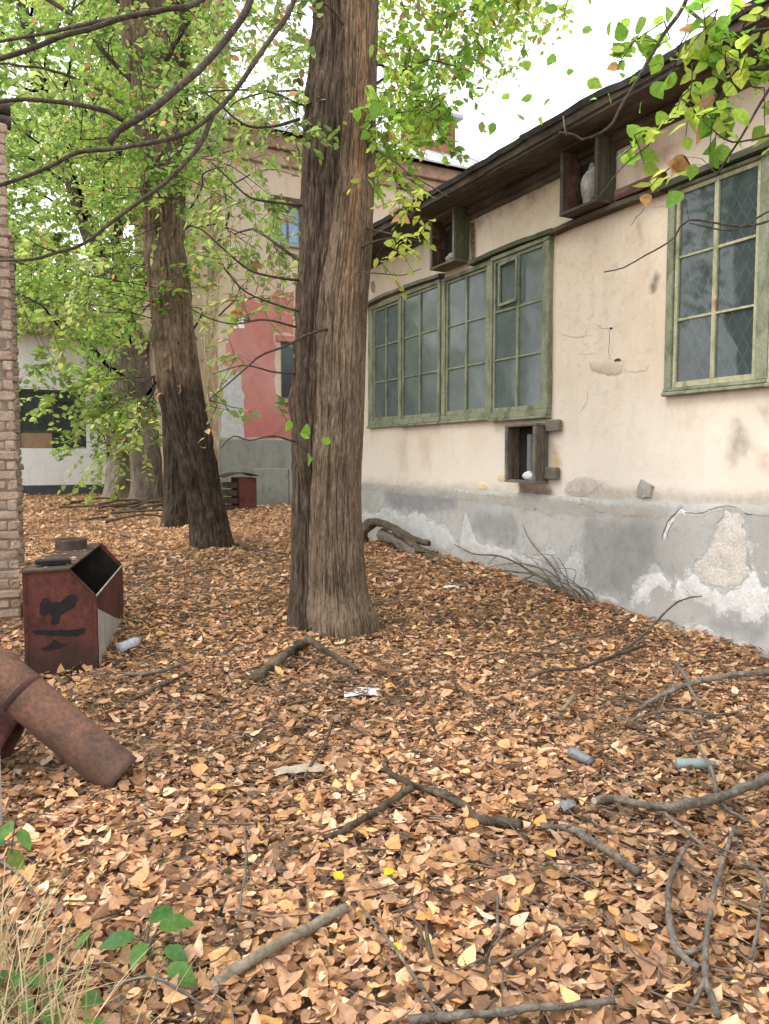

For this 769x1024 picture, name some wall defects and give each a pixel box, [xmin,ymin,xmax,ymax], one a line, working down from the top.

spalling [362,502,769,657]